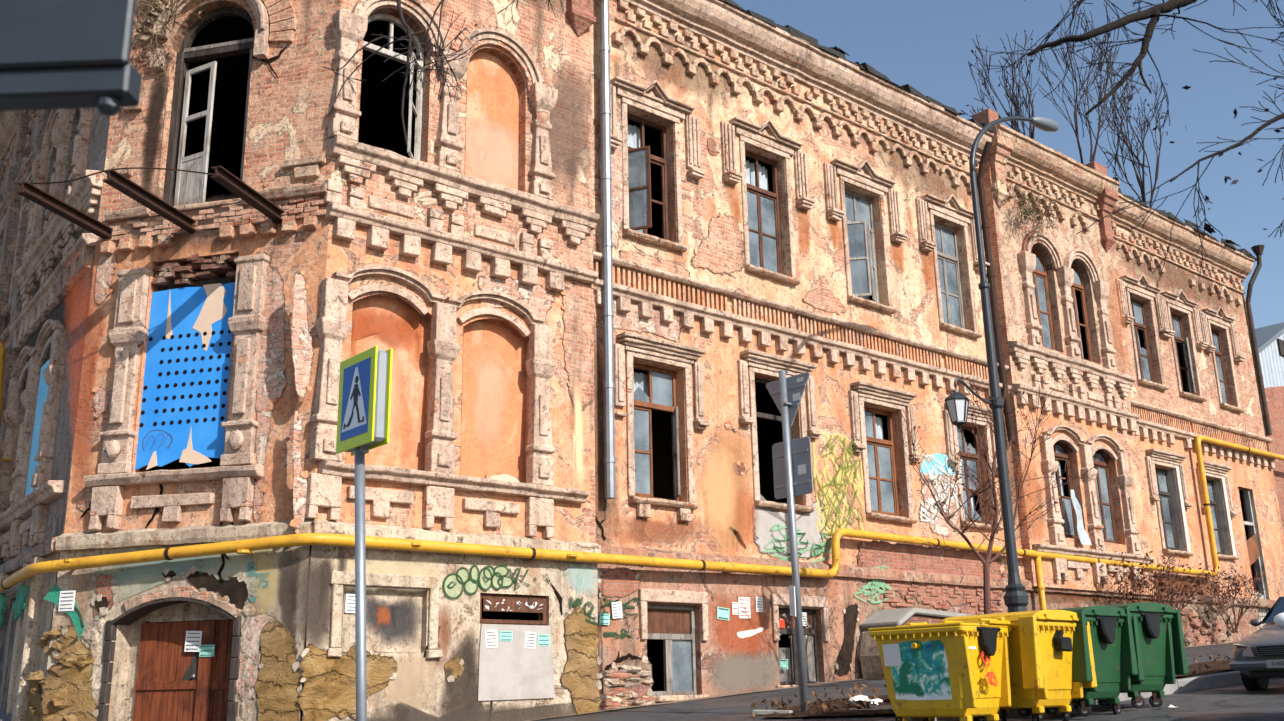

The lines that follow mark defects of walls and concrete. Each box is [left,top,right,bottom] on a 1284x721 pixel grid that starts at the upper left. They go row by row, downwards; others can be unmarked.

flaking render [25,572,118,721]
leakage [98,551,433,645]
flaking render [162,566,397,721]
flaking render [561,567,656,715]